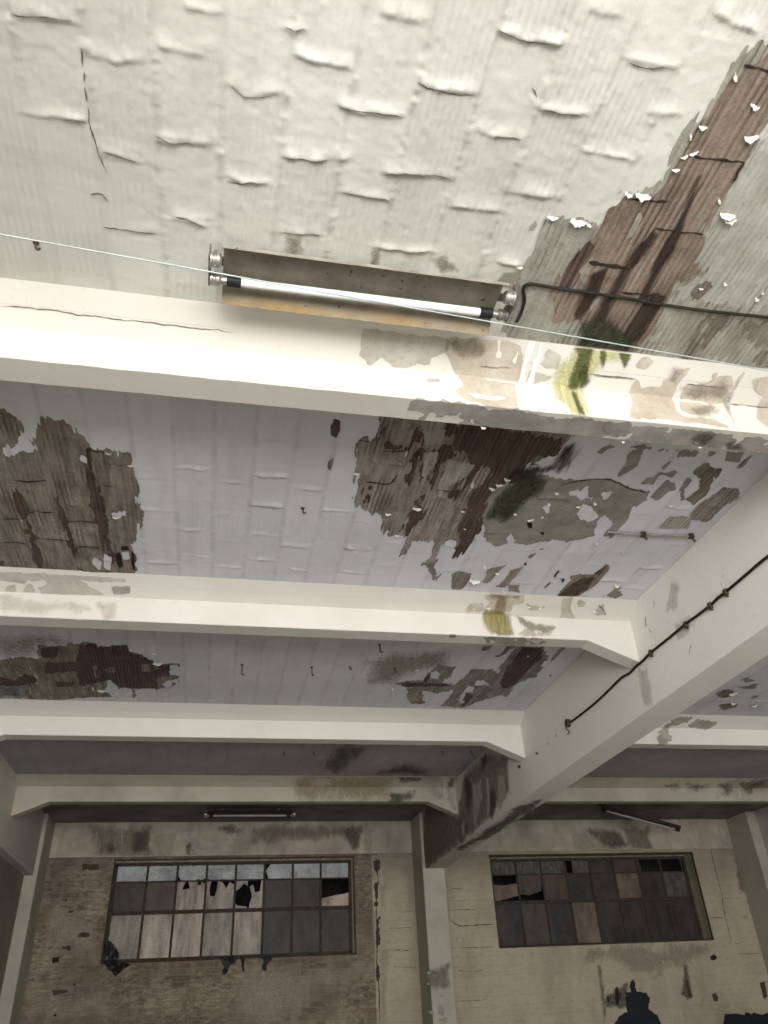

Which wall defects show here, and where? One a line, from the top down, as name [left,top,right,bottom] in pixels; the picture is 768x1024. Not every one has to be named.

crack [12,13,70,21]
crack [65,49,135,201]
crack [342,108,404,117]
crack [344,173,450,201]
crack [3,306,225,332]
leakage [496,340,561,412]
peeling [352,40,768,710]
crack [593,372,634,380]
crack [688,384,767,408]
peeling [0,408,144,595]
peeling [0,642,180,700]
leakage [299,748,540,866]